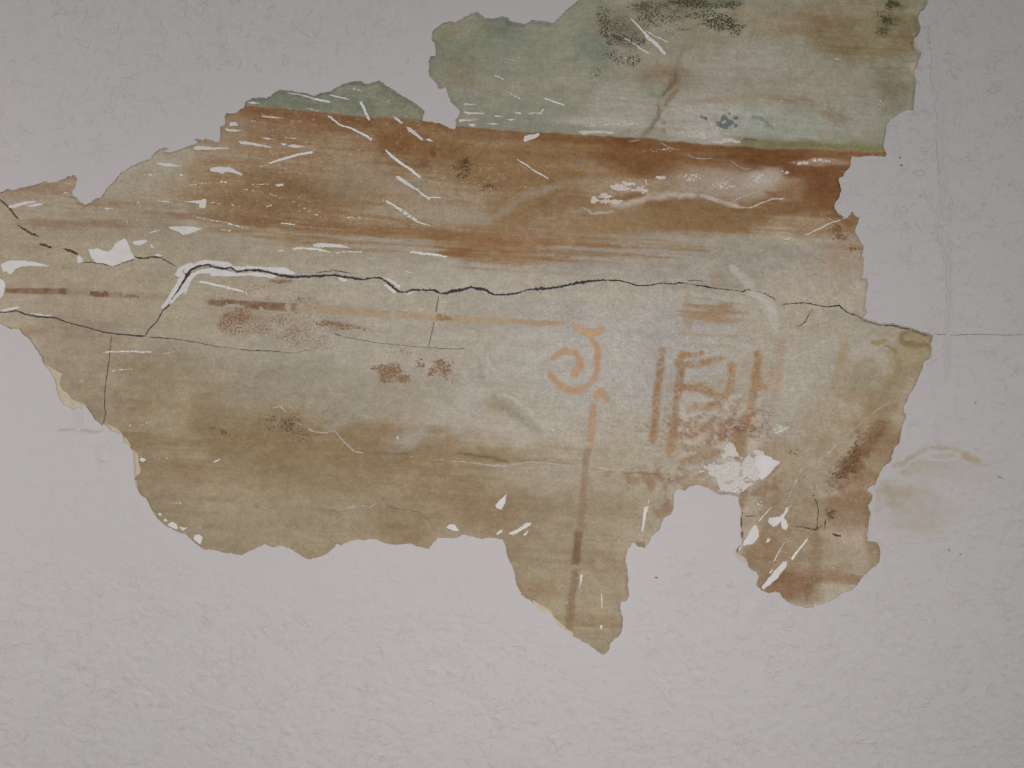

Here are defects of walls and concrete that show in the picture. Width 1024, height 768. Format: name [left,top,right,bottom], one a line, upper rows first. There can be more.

rust [811,212,862,252]
rust [198,279,377,352]
peeling [0,0,932,654]
crack [0,199,1023,423]
rust [369,349,459,389]